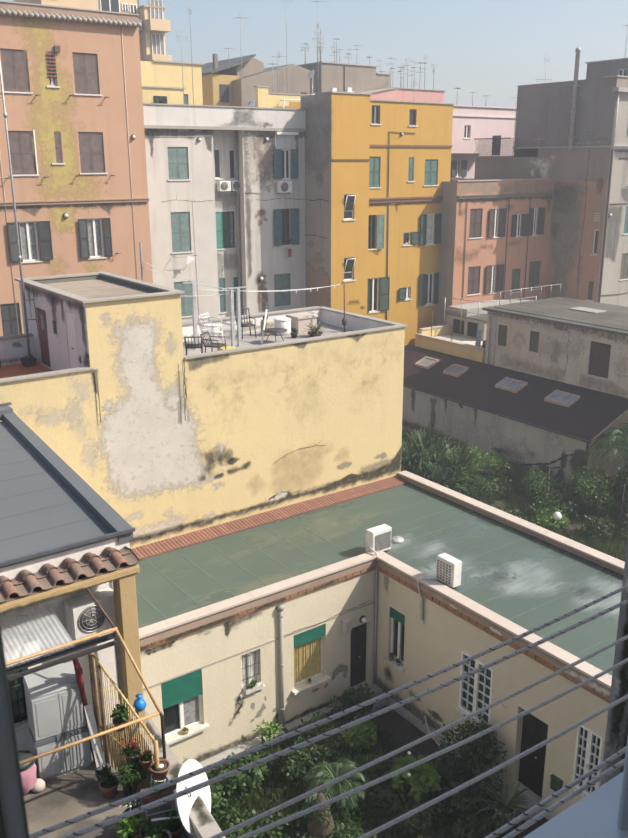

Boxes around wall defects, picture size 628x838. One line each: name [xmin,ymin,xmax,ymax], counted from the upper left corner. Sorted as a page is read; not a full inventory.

damp [233,112,275,291]
peeling [96,314,222,499]
damp [402,399,465,448]
damp [130,448,401,544]
spalling [229,697,276,726]